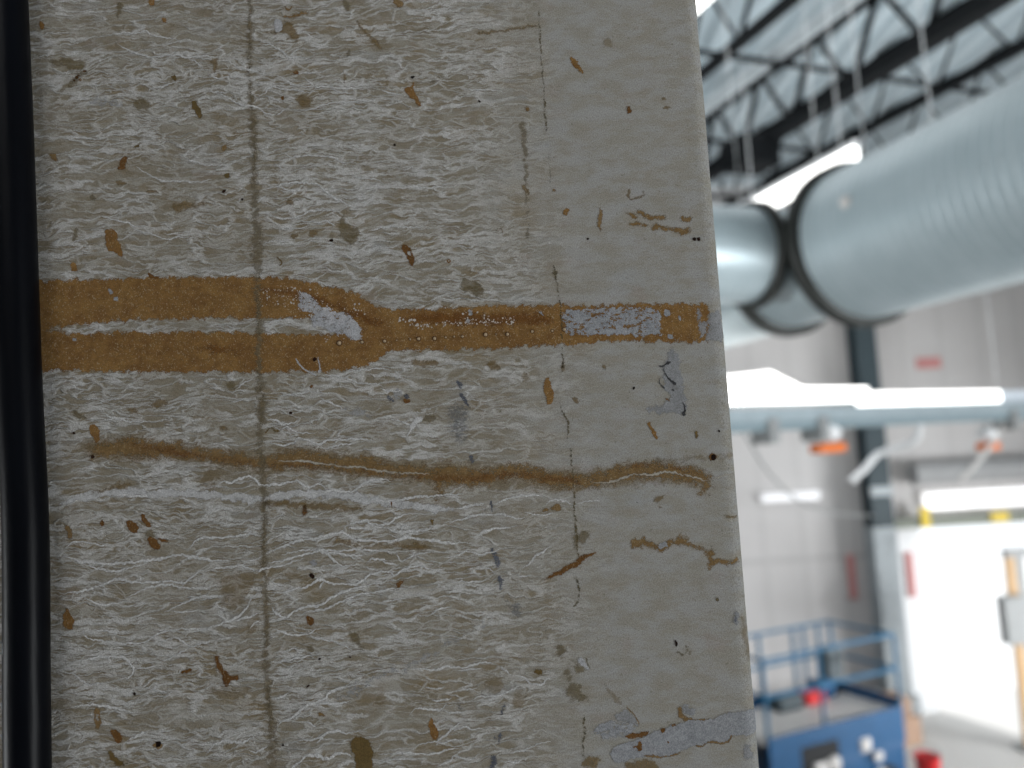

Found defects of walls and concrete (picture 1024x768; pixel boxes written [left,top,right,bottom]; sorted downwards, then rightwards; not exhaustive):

crack [538,11,547,132]
corrosion [627,189,693,235]
peeling [350,322,360,340]
corrosion [39,257,710,388]
crack [552,265,564,368]
corrosion [88,424,712,512]
corrosion [544,552,596,581]
corrosion [630,535,738,571]
peeling [610,708,756,763]